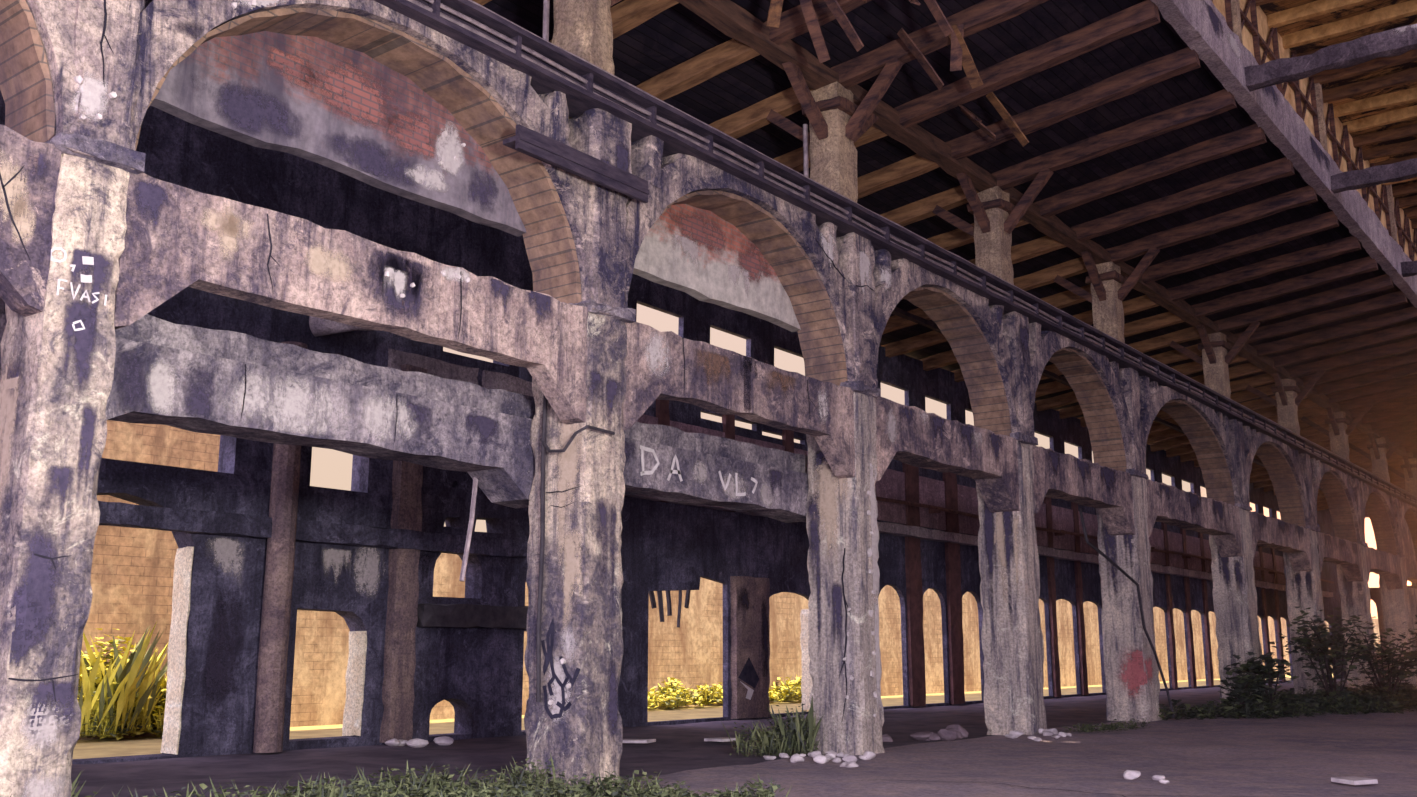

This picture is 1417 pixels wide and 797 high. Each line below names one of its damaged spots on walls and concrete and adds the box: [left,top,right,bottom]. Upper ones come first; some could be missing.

damp [216,83,300,136]
flaking render [268,49,466,190]
damp [331,135,414,184]
damp [468,170,498,207]
peeling [204,208,248,252]
peeling [309,247,348,280]
peeling [368,251,470,318]
flaking render [670,213,770,282]
damp [9,527,59,667]